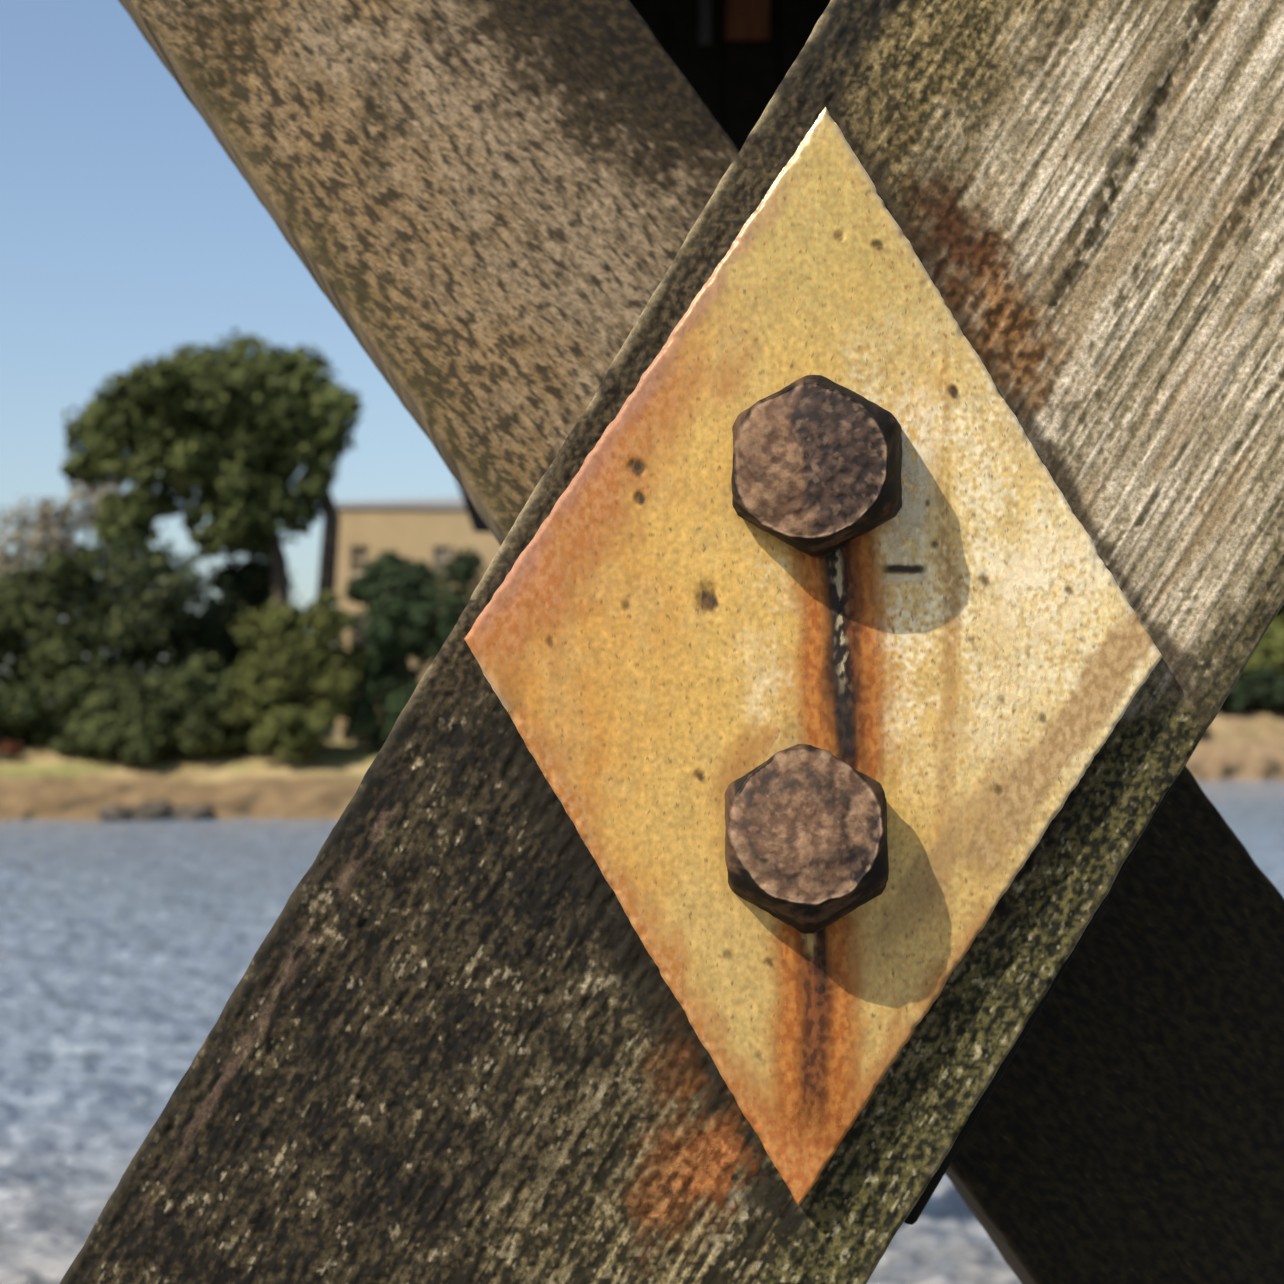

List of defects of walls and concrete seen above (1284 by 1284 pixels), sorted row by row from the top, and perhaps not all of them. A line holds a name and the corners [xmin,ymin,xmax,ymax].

corrosion [906,168,1055,412]
corrosion [464,375,679,658]
corrosion [799,532,879,779]
corrosion [508,707,986,1256]